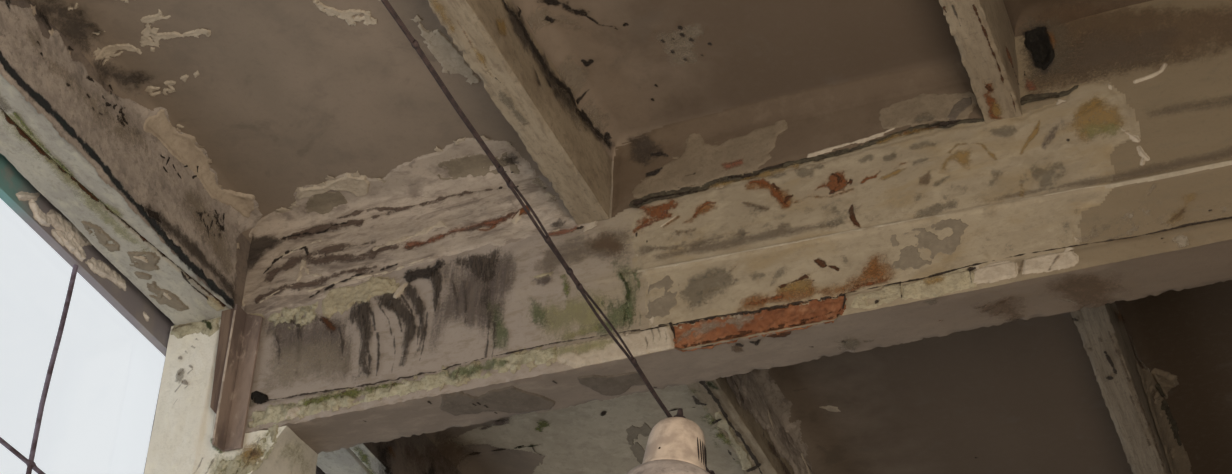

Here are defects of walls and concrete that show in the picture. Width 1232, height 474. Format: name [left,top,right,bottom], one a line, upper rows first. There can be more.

leakage [33,0,100,51]
leakage [497,0,629,149]
leakage [0,51,235,307]
peeling [0,0,984,392]
rust [633,200,716,242]
rust [747,179,793,208]
rust [816,163,905,227]
spalling [883,218,1079,300]
leakage [248,250,557,428]
peeling [626,423,652,464]